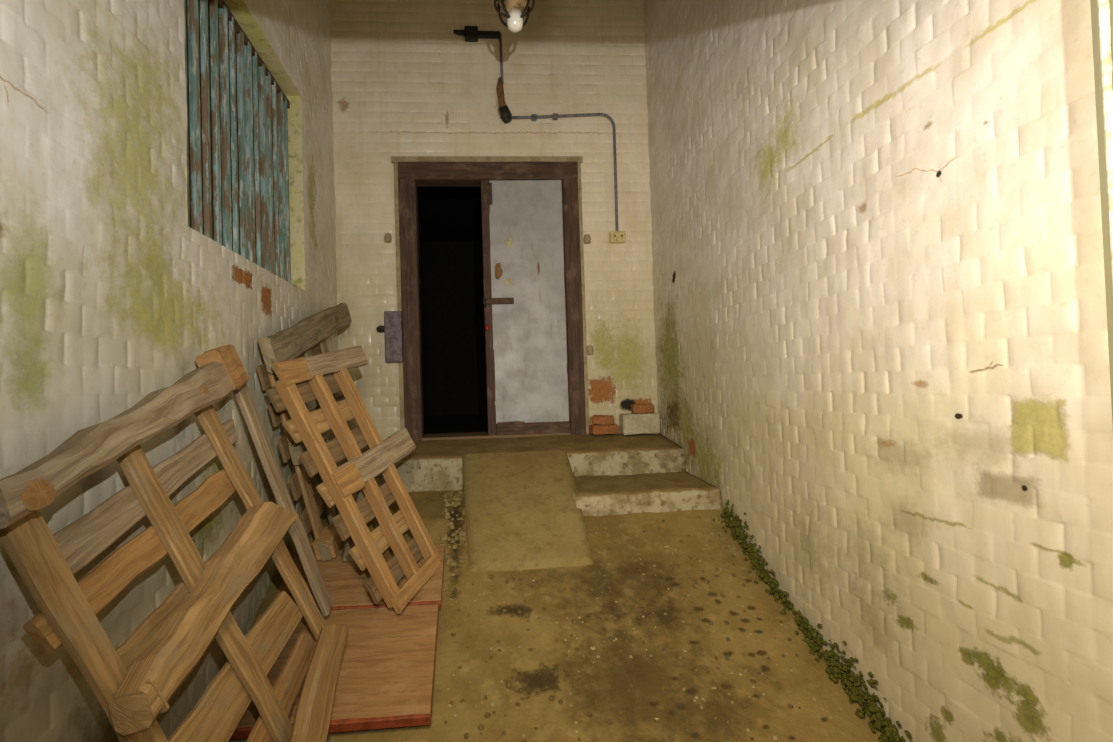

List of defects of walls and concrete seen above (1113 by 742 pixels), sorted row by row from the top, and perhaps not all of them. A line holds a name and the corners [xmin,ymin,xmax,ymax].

crack [0,76,44,109]
peeling [232,265,272,316]
spalling [588,376,616,425]
peeling [1011,400,1067,459]